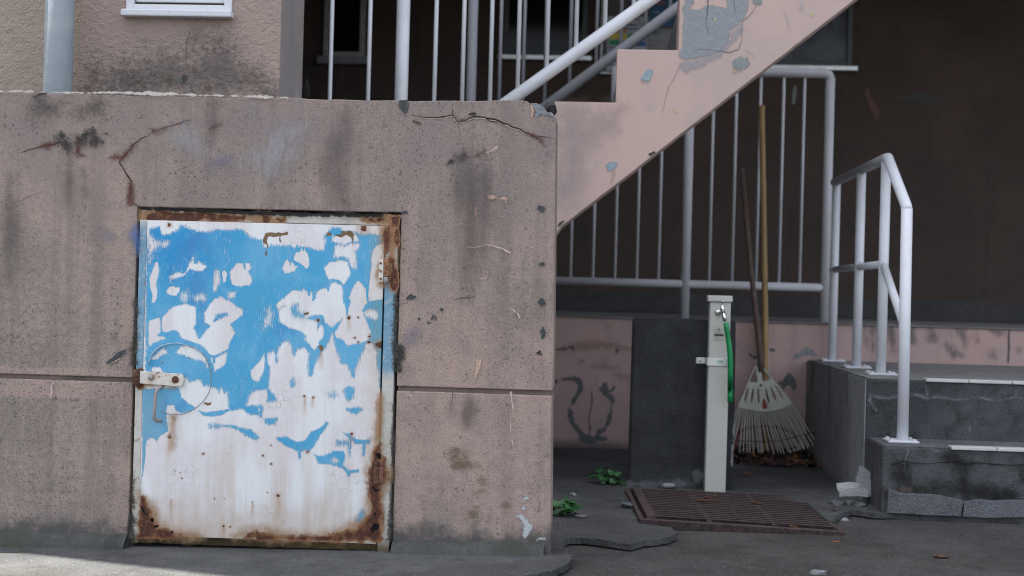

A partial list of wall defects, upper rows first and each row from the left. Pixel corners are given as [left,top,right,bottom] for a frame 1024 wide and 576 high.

crack [664,0,757,105]
peeling [679,0,762,74]
mould [53,100,104,154]
crack [412,102,550,146]
crack [21,119,192,208]
rust [139,210,286,223]
rust [234,393,392,544]
spalling [828,466,871,507]
rust [136,495,203,541]